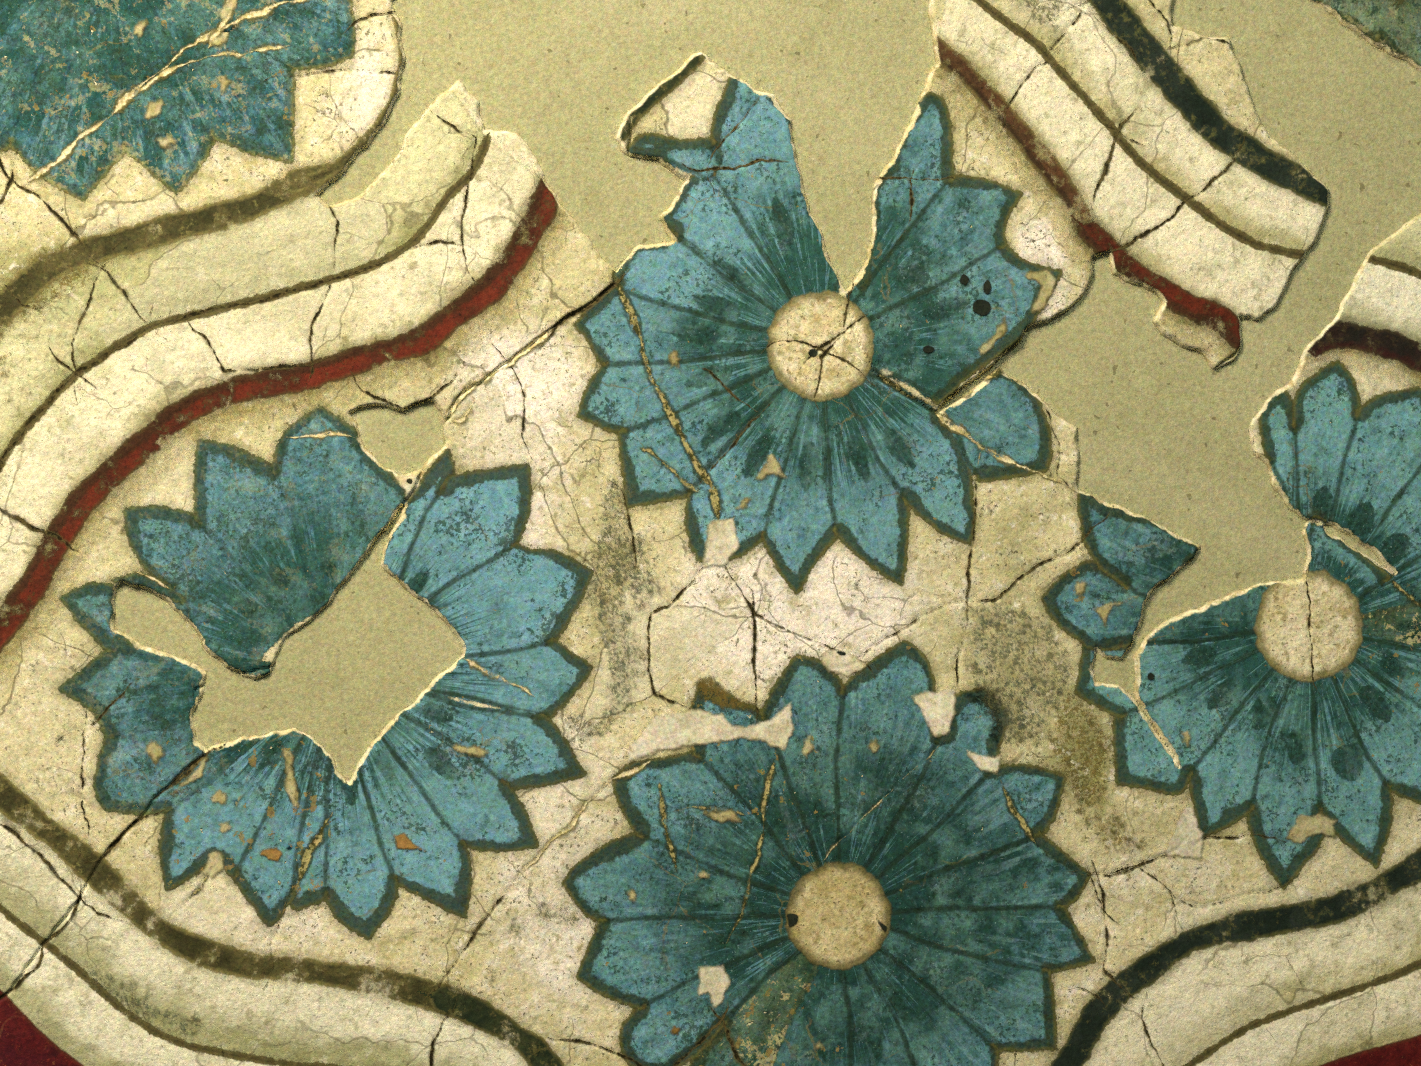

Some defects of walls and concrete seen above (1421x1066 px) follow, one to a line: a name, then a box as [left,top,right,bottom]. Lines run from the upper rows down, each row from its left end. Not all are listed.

crack [0,507,79,551]
peeling [203,852,223,877]
spalling [114,510,462,793]
peeling [283,749,299,808]
crack [0,0,772,520]
spalling [351,401,444,484]
crack [428,761,776,1066]
spalling [319,0,935,289]
crack [682,98,788,194]
crack [611,283,1114,721]
water stain [967,604,1143,848]
spalling [942,0,1421,733]